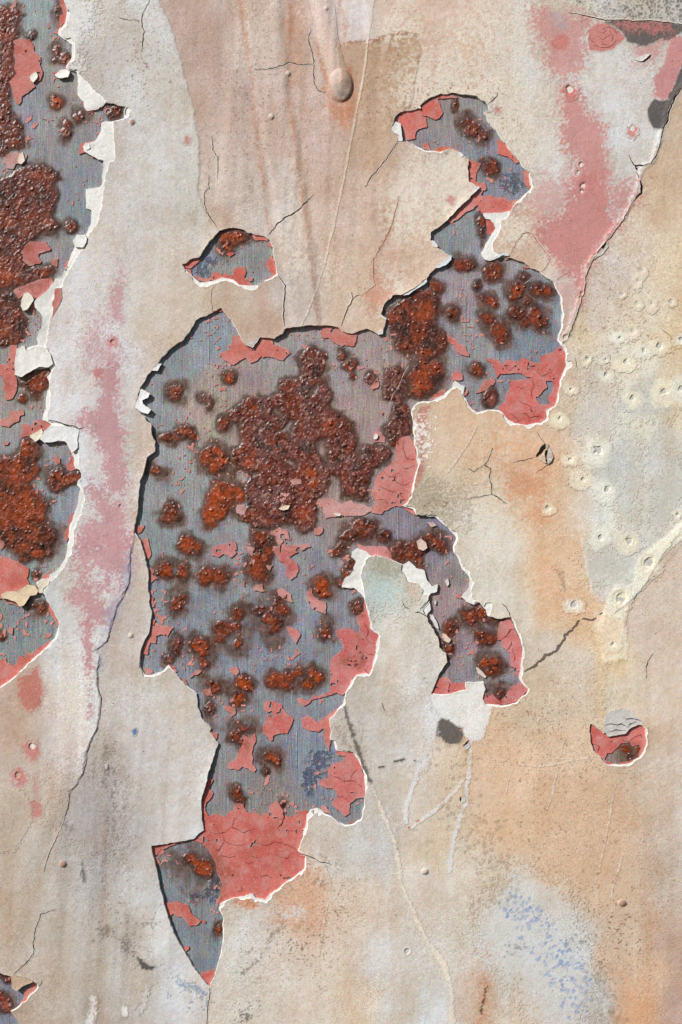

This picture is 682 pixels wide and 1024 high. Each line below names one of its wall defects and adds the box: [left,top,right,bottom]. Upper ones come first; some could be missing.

rust [0,0,84,352]
crack [204,139,220,230]
rust [10,368,51,417]
rust [0,429,81,624]
peeling [0,0,131,688]
rust [143,207,561,781]
peeling [134,93,682,987]
crack [466,367,550,504]
crack [503,604,603,672]
peeling [0,976,38,1024]